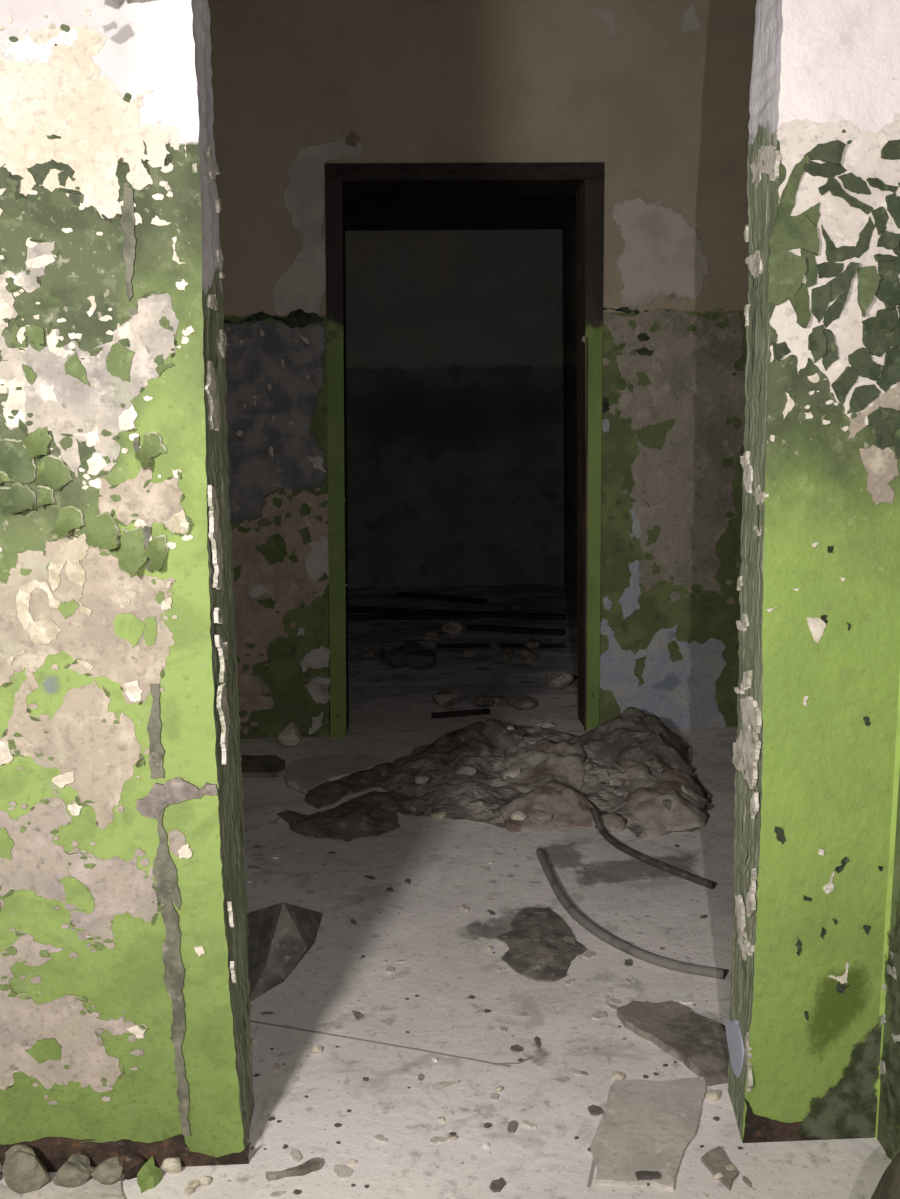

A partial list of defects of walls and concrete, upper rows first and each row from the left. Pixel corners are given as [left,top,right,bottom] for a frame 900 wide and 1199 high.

spalling [216,249,225,279]
spalling [205,328,244,431]
peeling [744,113,900,506]
peeling [0,9,220,1105]
peeling [208,446,330,764]
peeling [599,292,769,728]
peeling [806,615,828,643]
spalling [732,670,762,819]
spalling [735,869,757,960]